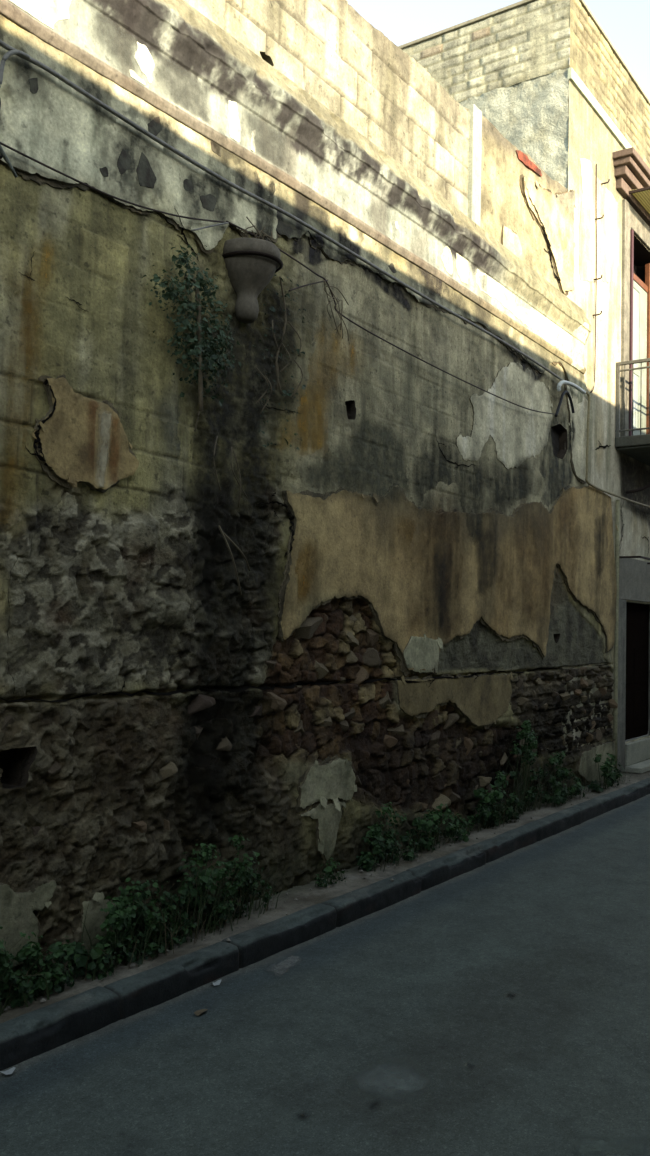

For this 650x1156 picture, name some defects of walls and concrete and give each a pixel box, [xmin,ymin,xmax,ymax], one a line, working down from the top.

peeling [9,0,71,29]
damp [81,73,108,114]
damp [98,14,135,61]
damp [116,111,176,201]
damp [162,58,208,120]
damp [248,115,283,164]
crack [522,180,561,289]
flaking render [0,14,618,784]
damp [307,417,575,575]
damp [180,282,296,845]
spalling [0,374,266,971]
flaking render [294,755,357,863]